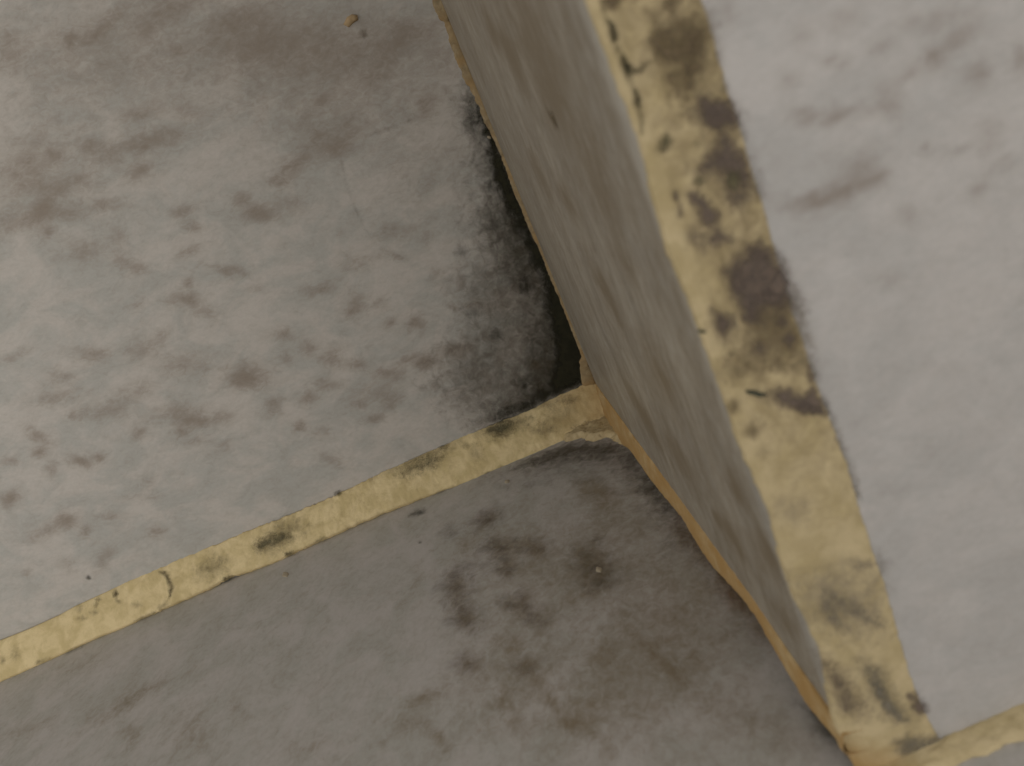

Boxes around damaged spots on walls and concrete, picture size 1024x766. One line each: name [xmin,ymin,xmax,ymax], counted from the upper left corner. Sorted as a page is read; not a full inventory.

leakage [674,98,748,245]
leakage [473,113,582,434]
leakage [716,247,800,353]
leakage [771,366,825,414]
leakage [906,693,926,715]